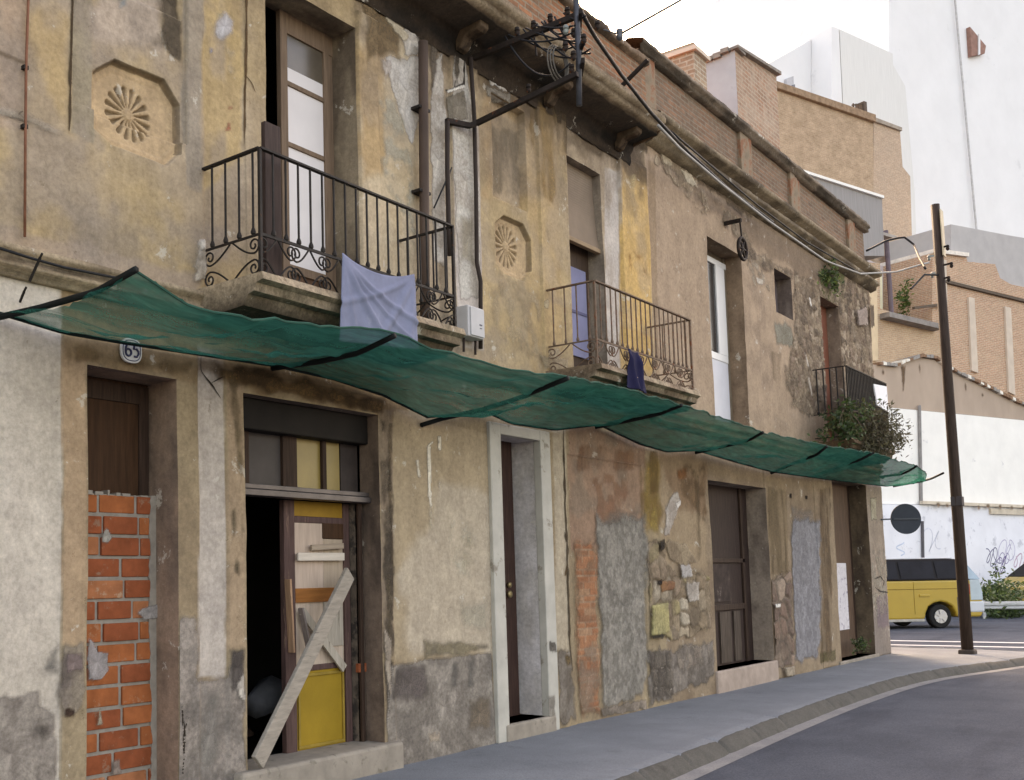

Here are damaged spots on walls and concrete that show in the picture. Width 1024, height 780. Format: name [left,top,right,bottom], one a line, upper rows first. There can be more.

flaking render [383,16,480,318]
spalling [654,154,875,416]
crack [201,370,223,397]
damp [386,641,496,765]
spalling [574,542,600,714]
spalling [647,493,712,640]
damp [647,641,715,705]